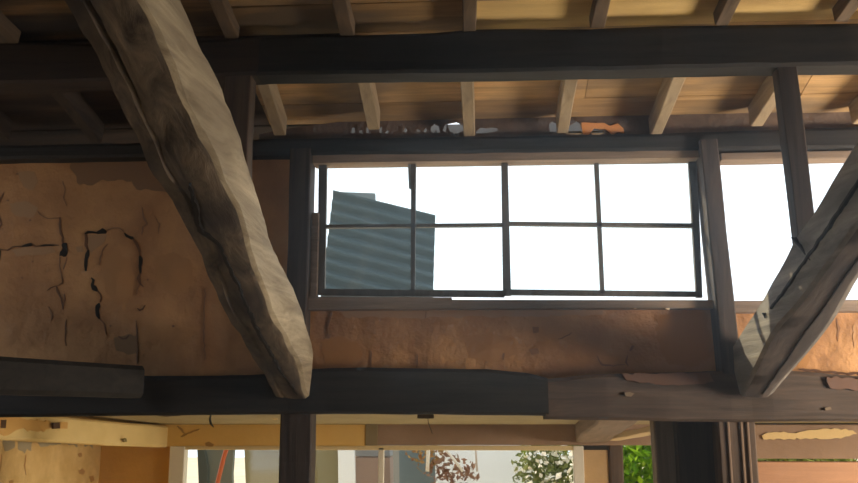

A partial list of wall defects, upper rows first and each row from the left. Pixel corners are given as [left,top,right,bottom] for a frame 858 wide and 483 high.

crack [0,181,160,363]
peeling [0,417,93,453]